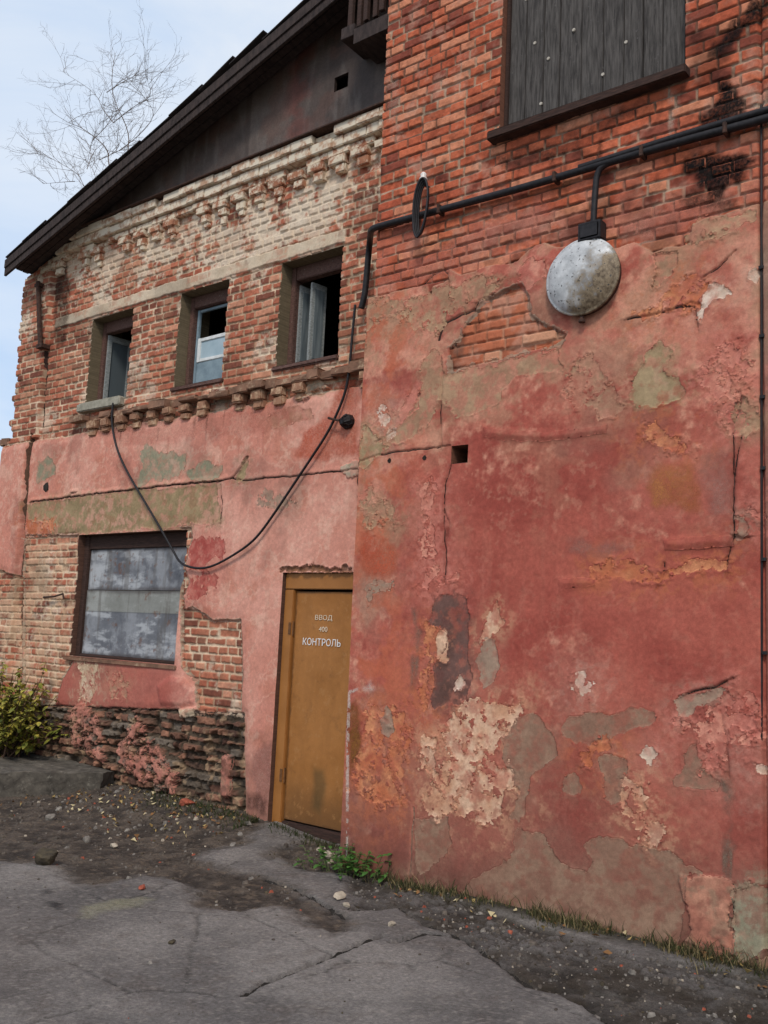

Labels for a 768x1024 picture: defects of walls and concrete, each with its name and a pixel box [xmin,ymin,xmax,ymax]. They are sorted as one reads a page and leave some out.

peeling [340,257,687,478]
flaking render [21,443,244,718]
crack [31,447,451,578]
peeling [346,477,768,968]
crack [688,682,725,694]
crack [727,398,742,562]